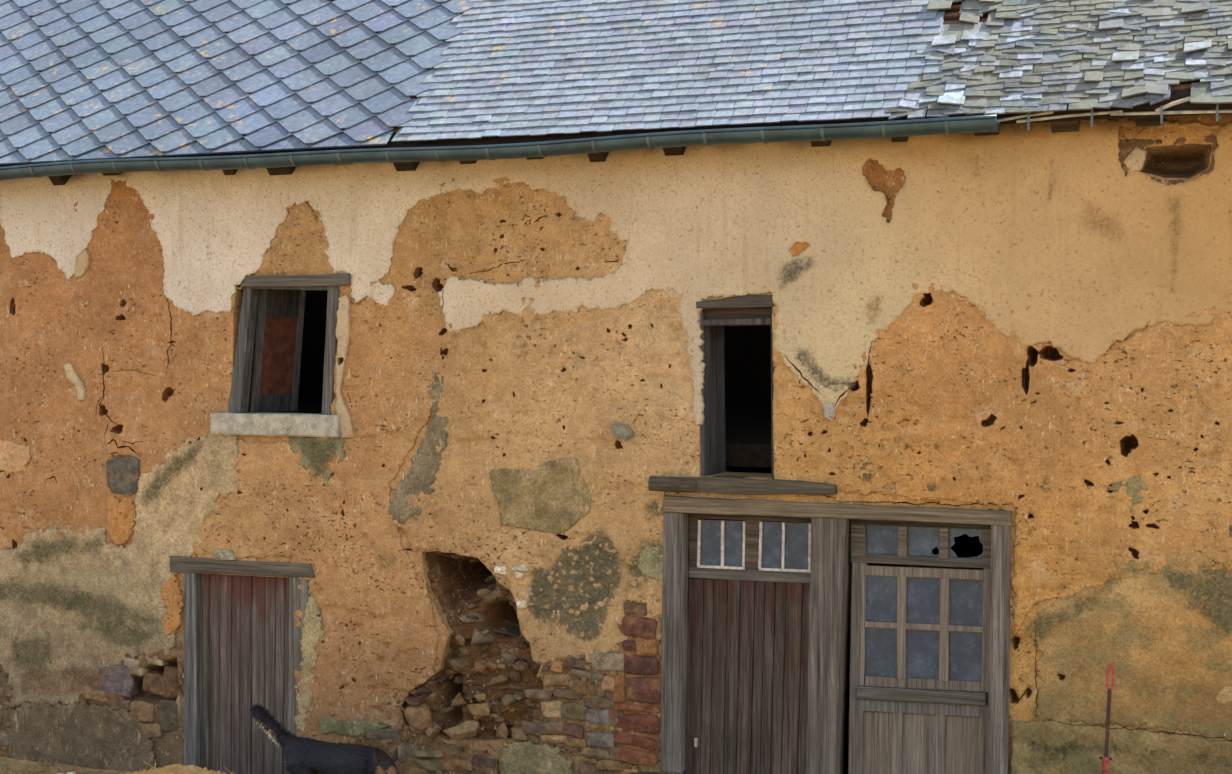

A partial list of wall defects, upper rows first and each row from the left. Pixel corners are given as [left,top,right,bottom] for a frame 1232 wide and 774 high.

spalling [862,158,907,223]
spalling [1118,133,1219,186]
spalling [0,179,236,550]
spalling [192,177,704,774]
spalling [772,283,1232,650]
damp [0,540,157,645]
damp [529,531,659,641]
damp [1168,566,1232,631]
crack [1015,620,1232,741]